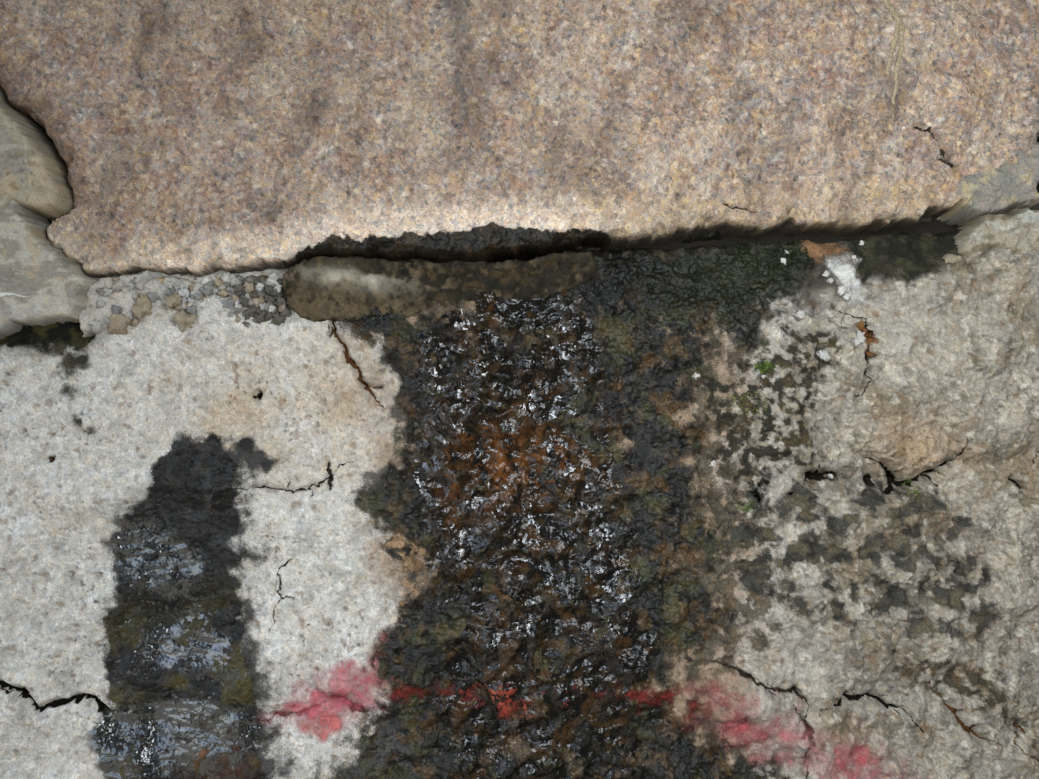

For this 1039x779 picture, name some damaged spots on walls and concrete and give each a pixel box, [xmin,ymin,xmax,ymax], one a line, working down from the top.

crack [328,320,384,407]
crack [236,461,353,497]
damp [283,222,1028,779]
crack [864,439,969,495]
damp [87,433,294,779]
crack [0,680,114,715]
crack [712,660,925,779]